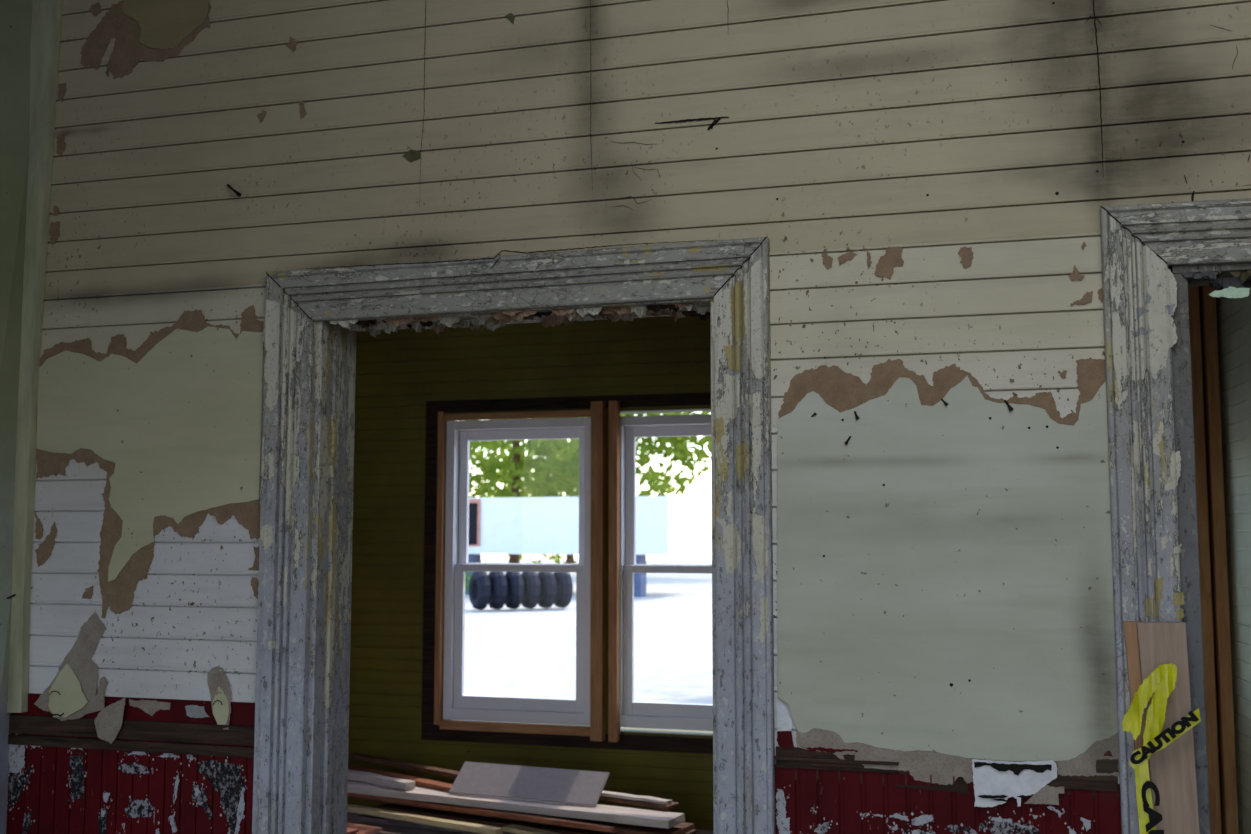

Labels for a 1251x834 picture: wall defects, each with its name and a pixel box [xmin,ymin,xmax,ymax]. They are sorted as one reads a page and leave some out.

crack [418,6,426,203]
crack [585,0,729,210]
crack [1085,0,1104,177]
crack [308,240,713,269]
peeling [1131,203,1251,236]
peeling [1122,236,1251,385]
peeling [324,246,770,646]
peeling [7,734,43,834]
peeling [66,737,87,808]
peeling [98,751,247,834]
peeling [775,785,838,834]
peeling [857,805,1095,834]